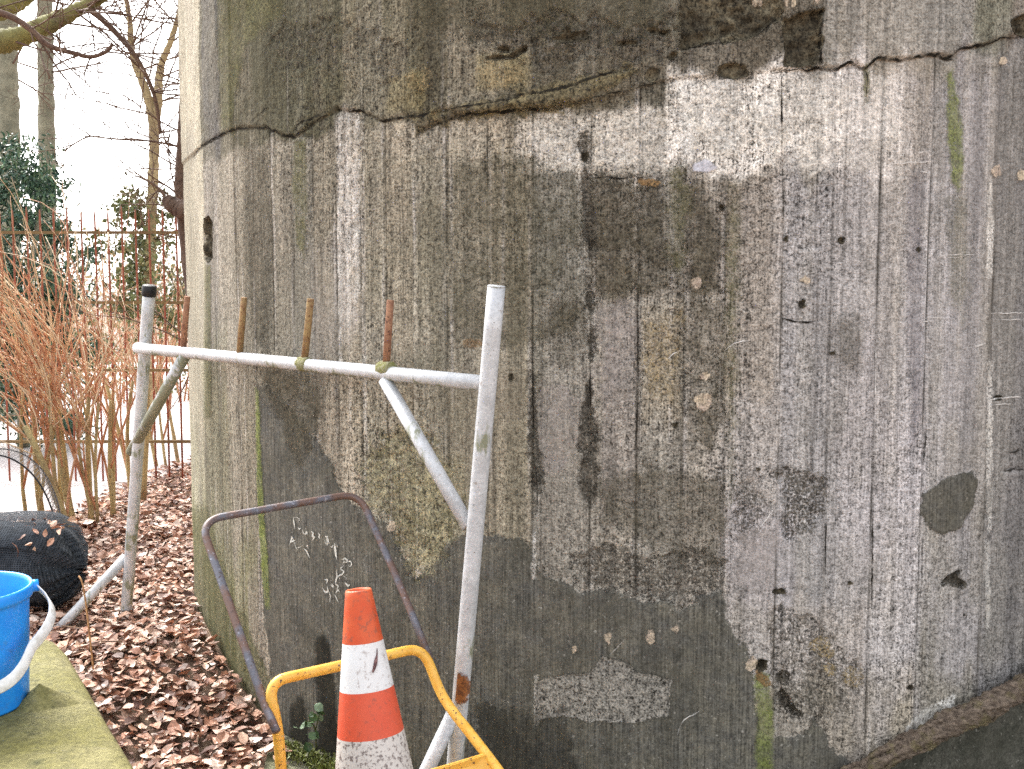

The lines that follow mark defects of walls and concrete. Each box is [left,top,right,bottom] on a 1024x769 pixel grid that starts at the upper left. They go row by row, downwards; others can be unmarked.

crack [193,69,654,157]
crack [775,10,1021,219]
spalling [203,216,213,263]
damp [289,518,352,602]
peeling [256,382,466,769]
damp [289,635,337,756]
peeling [464,534,851,769]